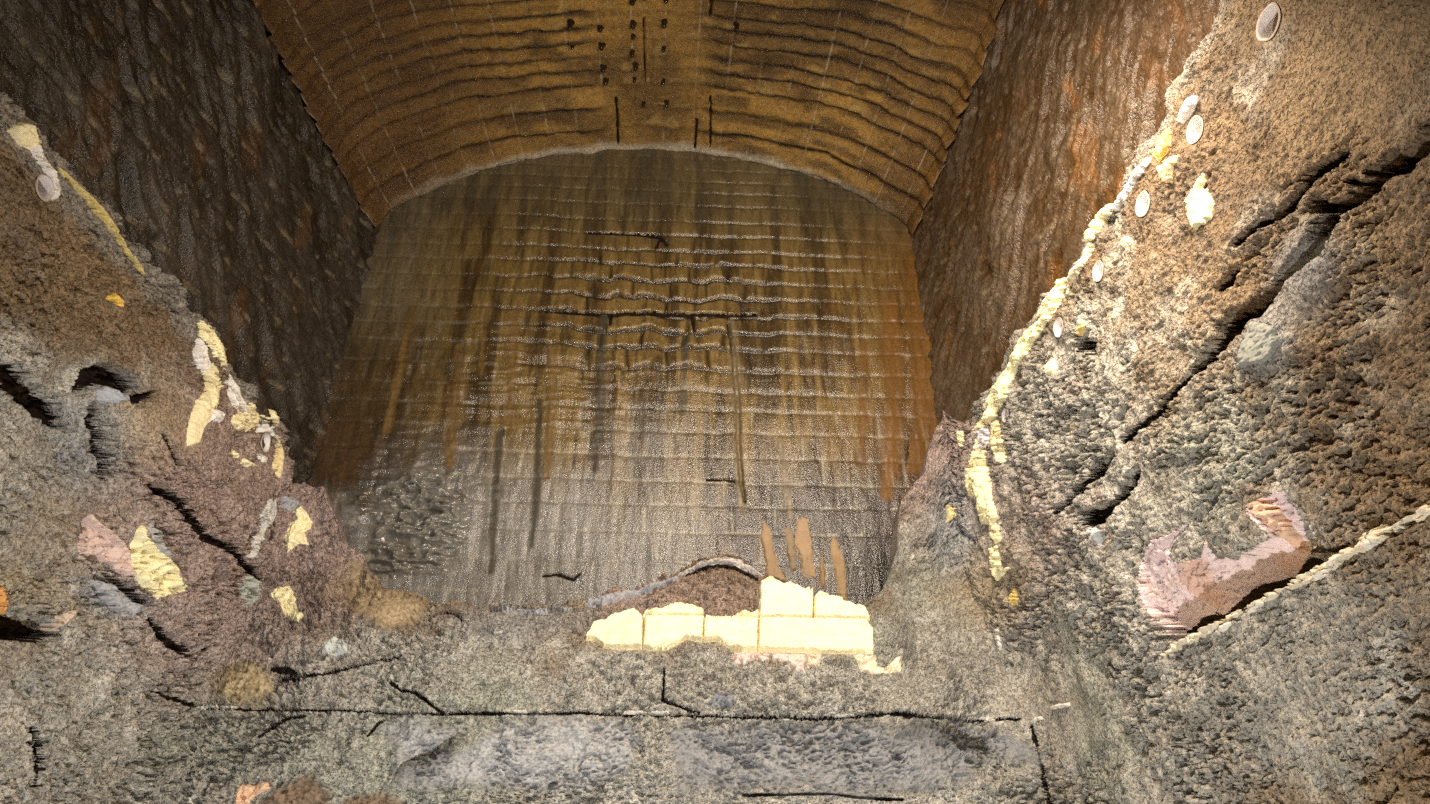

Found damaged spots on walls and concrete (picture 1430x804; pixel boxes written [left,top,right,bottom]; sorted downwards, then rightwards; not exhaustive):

crack [0,364,153,479]
spalling [77,514,188,599]
crack [101,573,195,657]
crack [147,434,263,580]
damp [489,430,503,573]
damp [530,398,541,547]
damp [593,315,606,472]
damp [681,335,689,414]
flaking render [499,576,901,676]
crack [1052,140,1430,528]
spalling [1137,491,1348,642]
crack [150,654,1053,804]